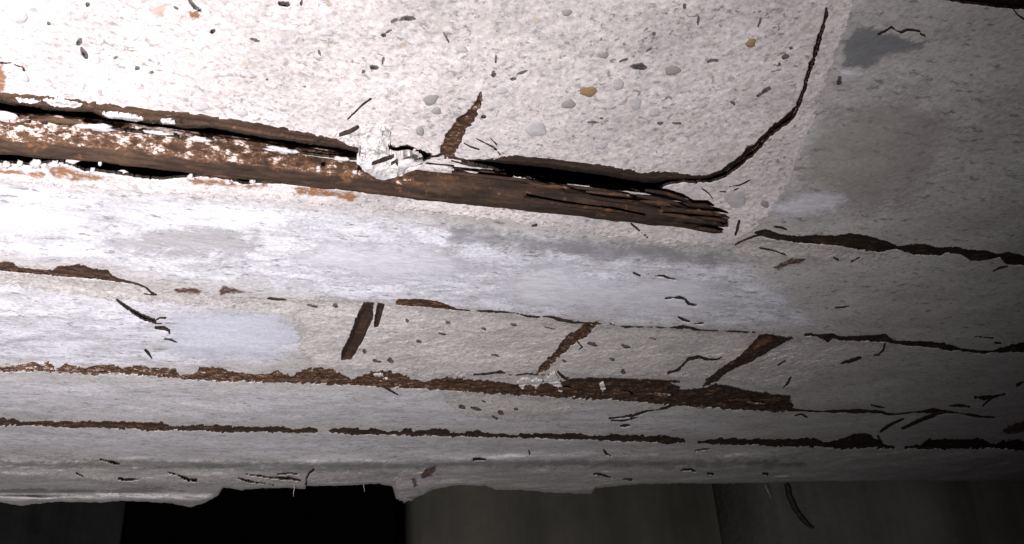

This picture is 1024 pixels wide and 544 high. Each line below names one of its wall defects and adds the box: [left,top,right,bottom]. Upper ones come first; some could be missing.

water stain [838,27,925,76]
spalling [0,0,1024,272]
crack [422,7,828,199]
rust [0,167,101,181]
rust [189,178,265,187]
rust [296,187,356,201]
crack [451,271,774,375]
crack [777,360,1024,433]